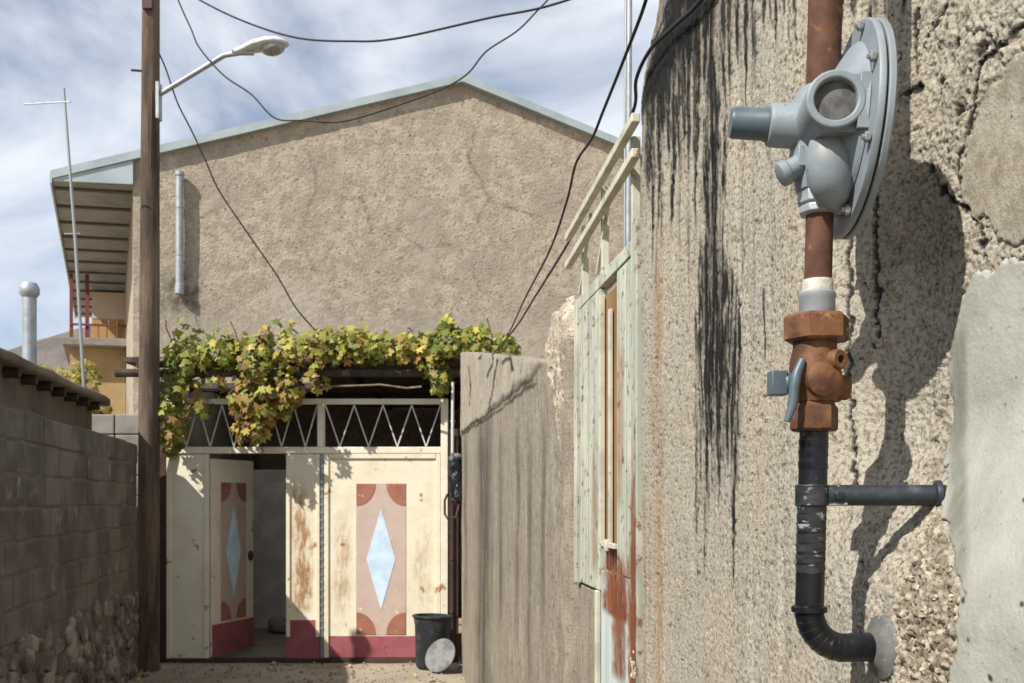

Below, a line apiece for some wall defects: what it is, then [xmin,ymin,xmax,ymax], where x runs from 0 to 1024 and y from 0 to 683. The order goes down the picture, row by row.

crack [899,2,949,97]
crack [935,23,1024,256]
peeling [545,296,575,440]
leakage [641,0,797,582]
corrosion [294,494,311,607]
corrosion [602,475,636,683]